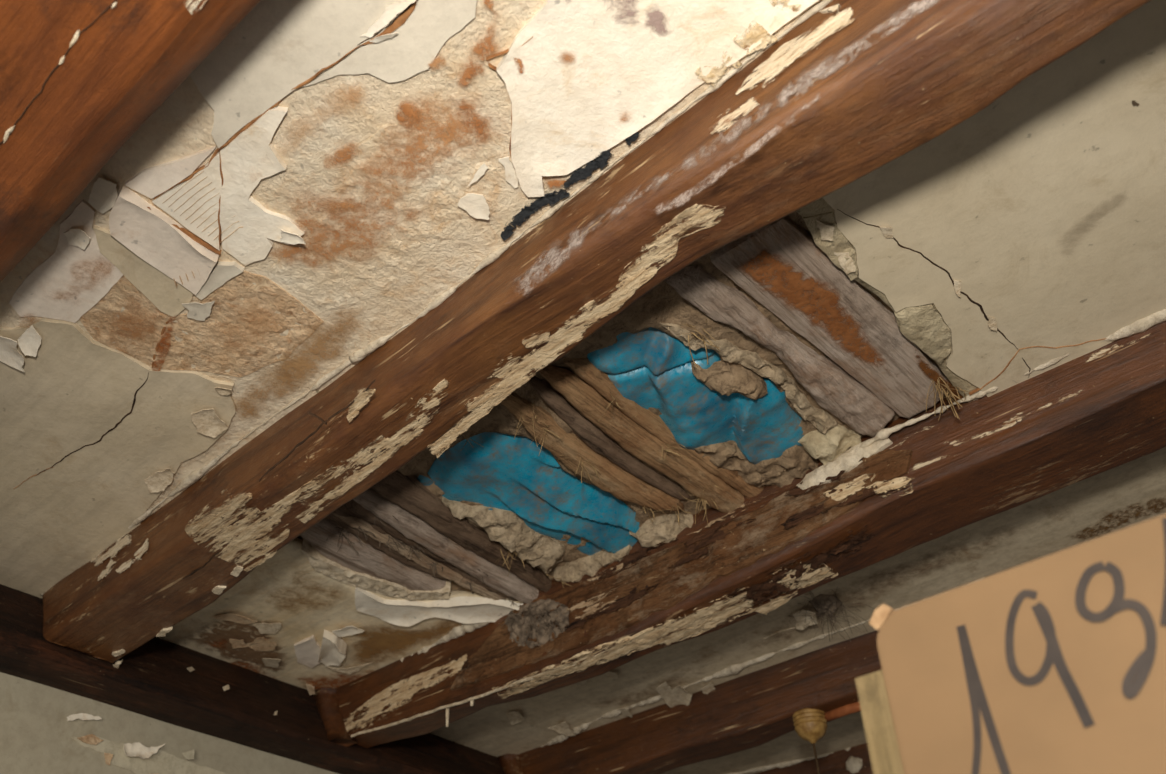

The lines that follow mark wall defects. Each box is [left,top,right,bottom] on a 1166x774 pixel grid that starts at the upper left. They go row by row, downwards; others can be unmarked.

leakage [618,0,666,34]
crack [0,0,117,145]
peeling [0,0,862,598]
crack [837,209,1106,395]
crack [14,315,170,489]
peeling [907,390,1081,473]
peeling [301,538,523,627]
peeling [112,649,125,669]
flaking render [195,613,283,671]
peeling [294,626,371,674]
peeling [344,562,838,737]
peeling [71,734,228,774]